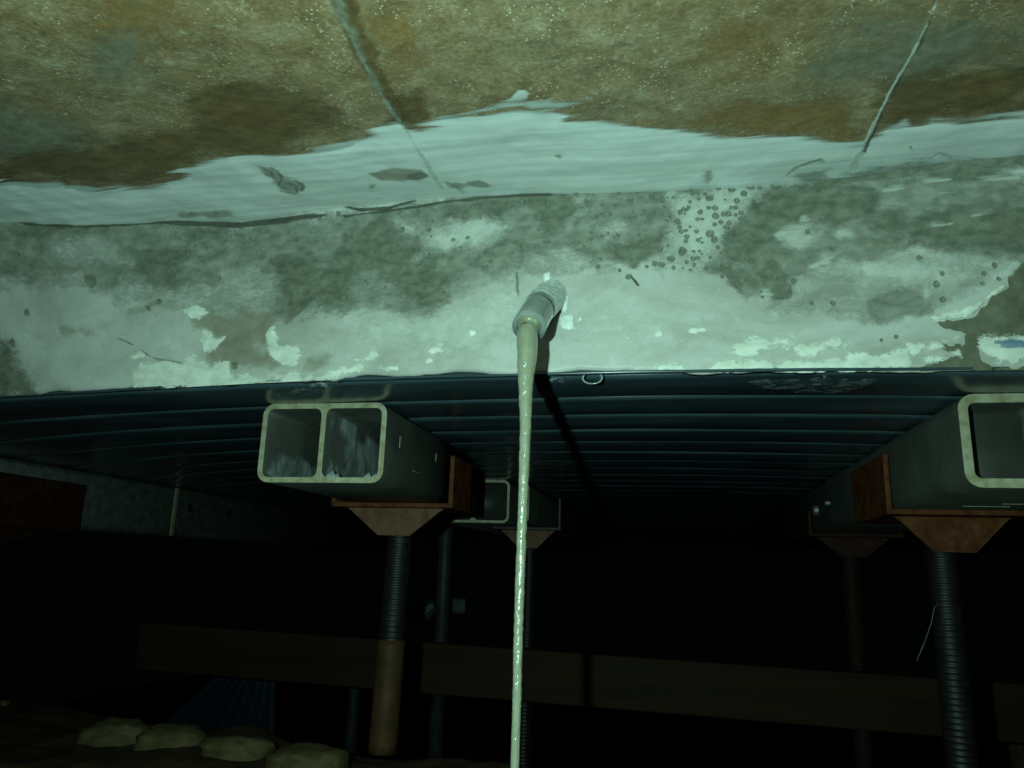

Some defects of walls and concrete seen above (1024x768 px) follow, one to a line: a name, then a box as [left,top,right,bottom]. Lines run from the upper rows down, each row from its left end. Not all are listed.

rust [190,82,320,124]
rust [388,91,428,126]
damp [439,101,578,119]
crack [825,5,1024,183]
rust [880,69,1024,123]
spalling [573,184,774,285]
damp [705,164,1024,299]
damp [0,189,705,363]
peeling [183,305,226,353]
peeling [265,325,302,372]
spalling [709,261,1024,373]
damp [869,291,932,323]